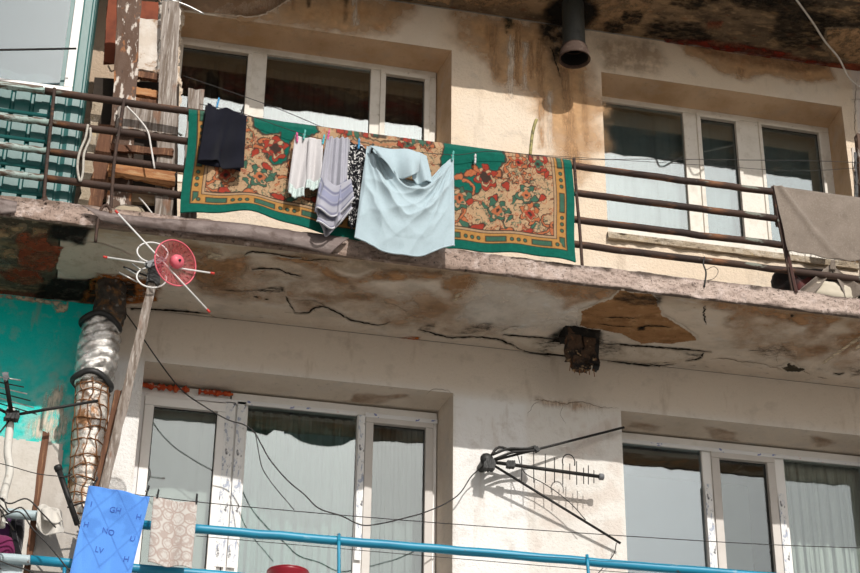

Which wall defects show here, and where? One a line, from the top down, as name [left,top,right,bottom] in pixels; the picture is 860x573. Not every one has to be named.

spalling [402,0,453,8]
spalling [585,0,652,32]
damp [684,45,834,82]
spalling [665,26,860,71]
damp [454,11,604,173]
damp [173,244,265,300]
crack [245,251,338,279]
damp [276,255,477,325]
crack [286,297,552,356]
spalling [577,288,699,345]
damp [717,303,840,333]
crack [602,344,790,368]